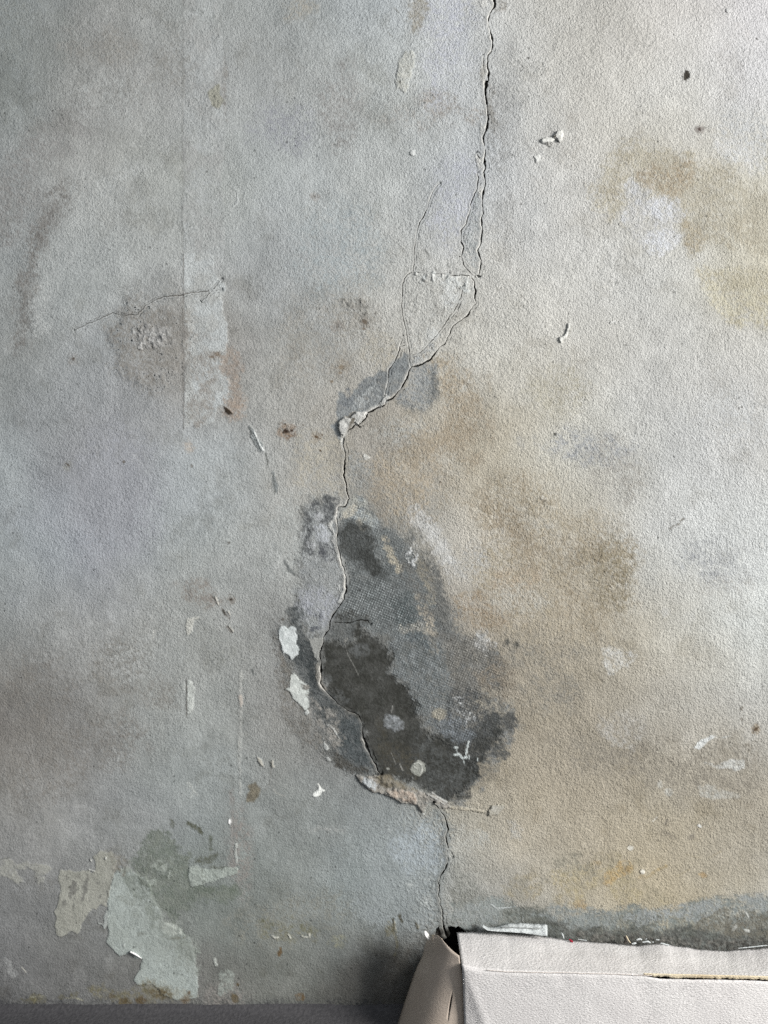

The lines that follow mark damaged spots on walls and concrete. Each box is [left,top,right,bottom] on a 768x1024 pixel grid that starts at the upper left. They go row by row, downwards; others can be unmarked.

water stain [584,130,768,334]
crack [75,278,223,332]
crack [316,0,499,776]
water stain [359,340,648,676]
peeling [322,723,340,762]
water stain [373,715,424,781]
spalling [356,767,451,815]
water stain [596,706,648,754]
peeling [0,849,238,1004]
crack [432,802,453,939]
water stain [446,849,768,951]